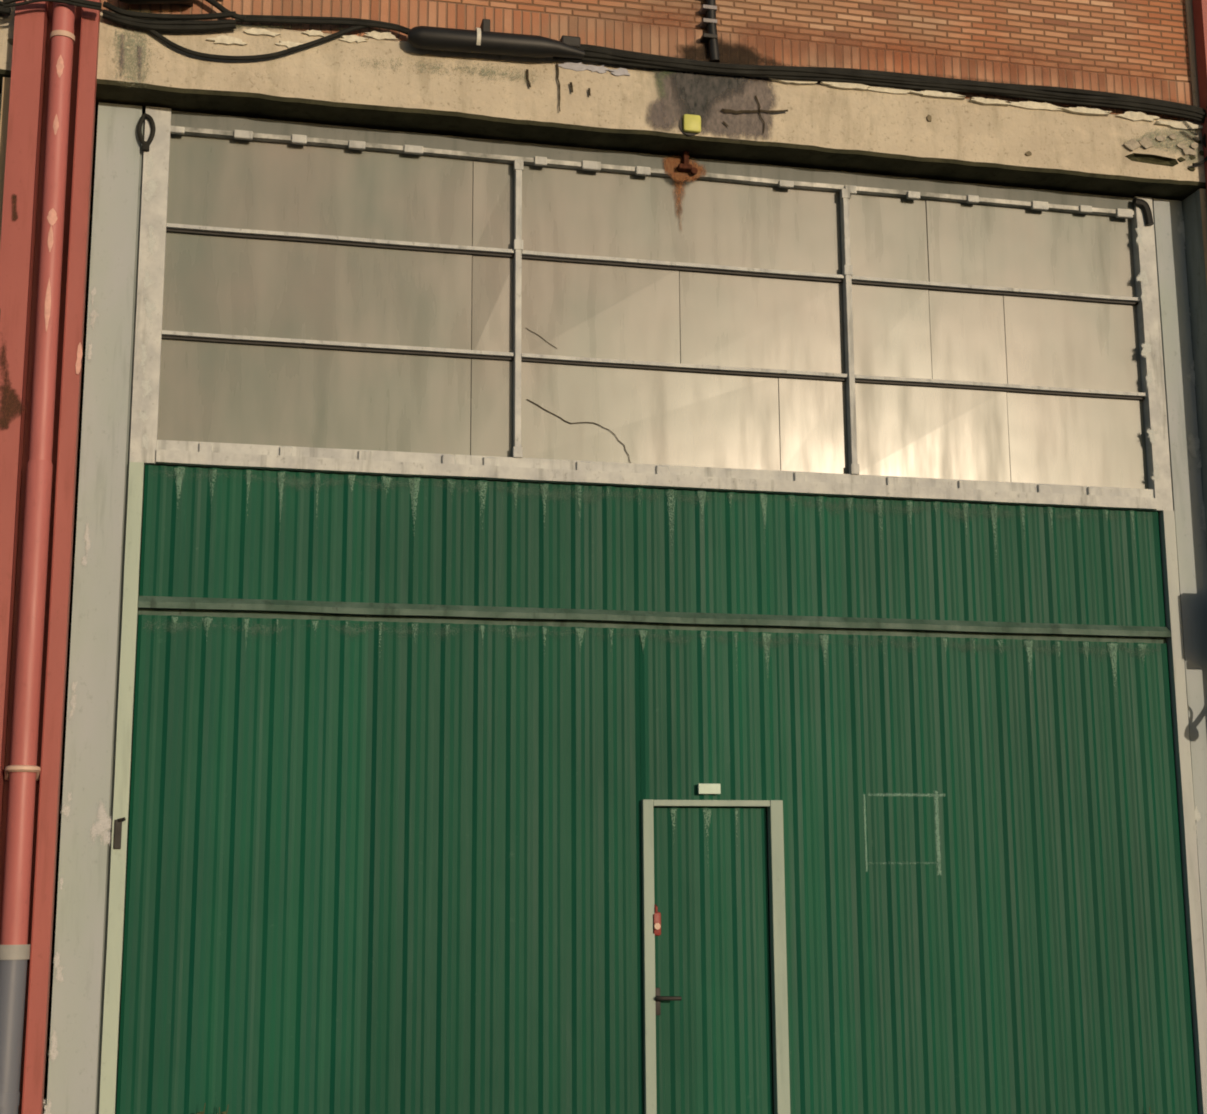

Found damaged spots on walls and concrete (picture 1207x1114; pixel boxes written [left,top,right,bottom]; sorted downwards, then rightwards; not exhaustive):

water stain [647,70,776,139]
peeling [769,78,1204,171]
rust [664,155,706,211]
crack [527,399,631,463]
water stain [174,467,185,509]
water stain [381,476,421,534]
water stain [667,490,676,544]
water stain [1024,640,1033,685]
water stain [1107,643,1118,699]